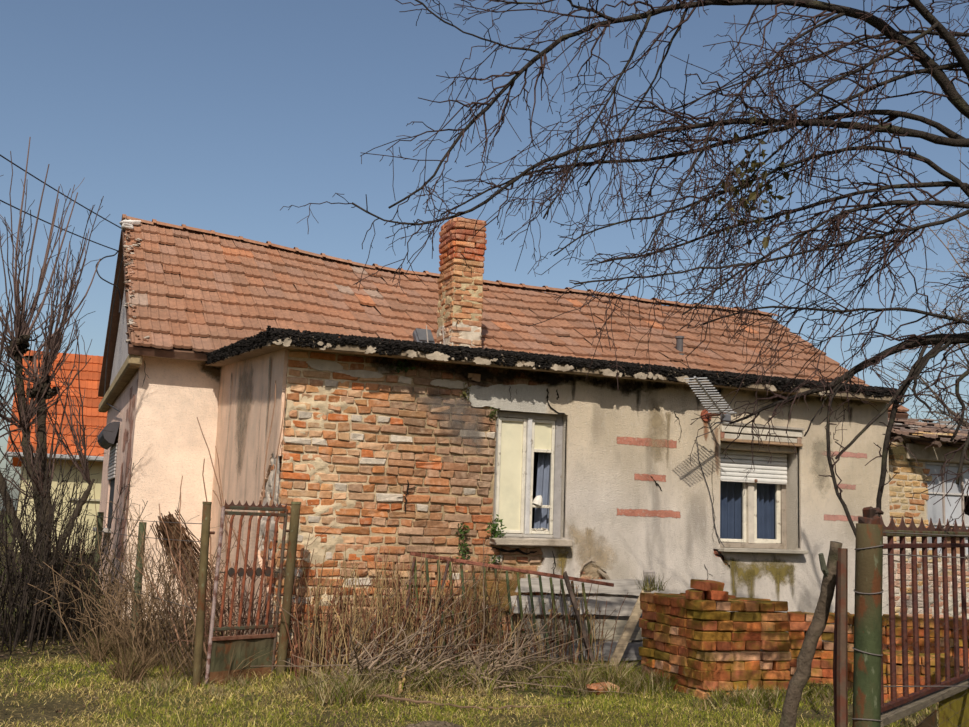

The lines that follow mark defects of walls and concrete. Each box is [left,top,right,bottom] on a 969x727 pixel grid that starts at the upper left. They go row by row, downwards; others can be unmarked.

damp [201,364,252,471]
peeling [599,369,689,383]
flaking render [258,338,574,668]